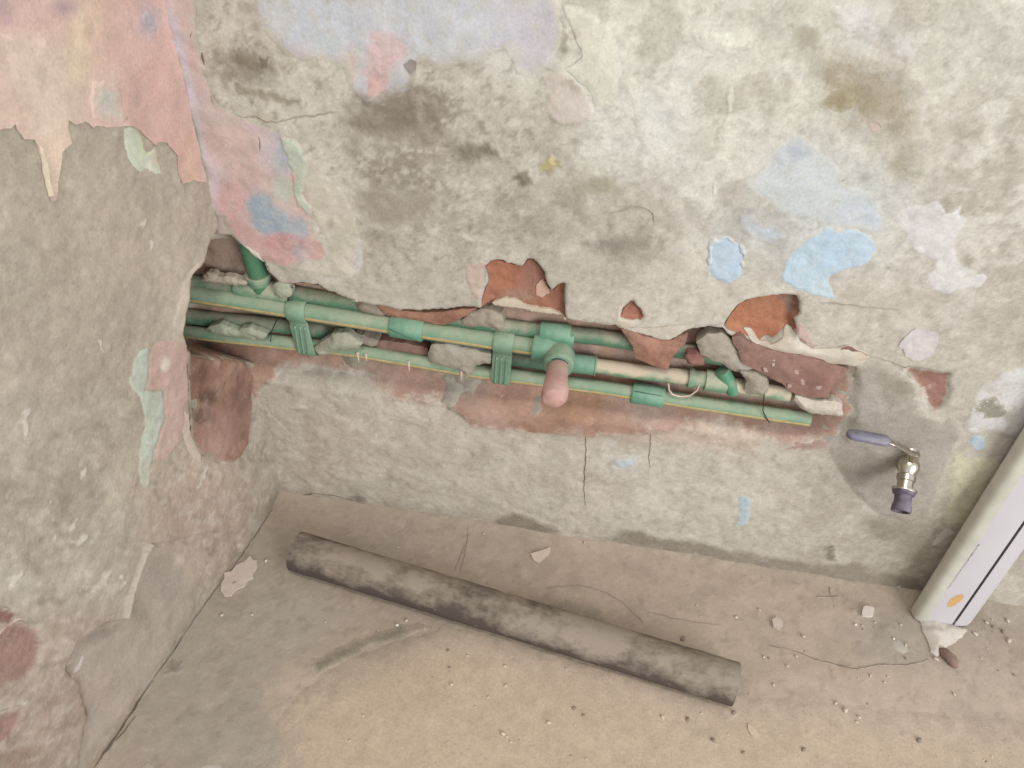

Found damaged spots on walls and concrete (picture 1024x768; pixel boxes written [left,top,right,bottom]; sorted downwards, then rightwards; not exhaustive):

damp [332,97,504,167]
damp [510,154,563,189]
damp [346,179,443,237]
peeling [0,0,870,489]
peeling [888,195,988,296]
spalling [898,328,950,411]
crack [581,436,589,505]
crack [546,585,722,626]
crack [770,646,929,670]